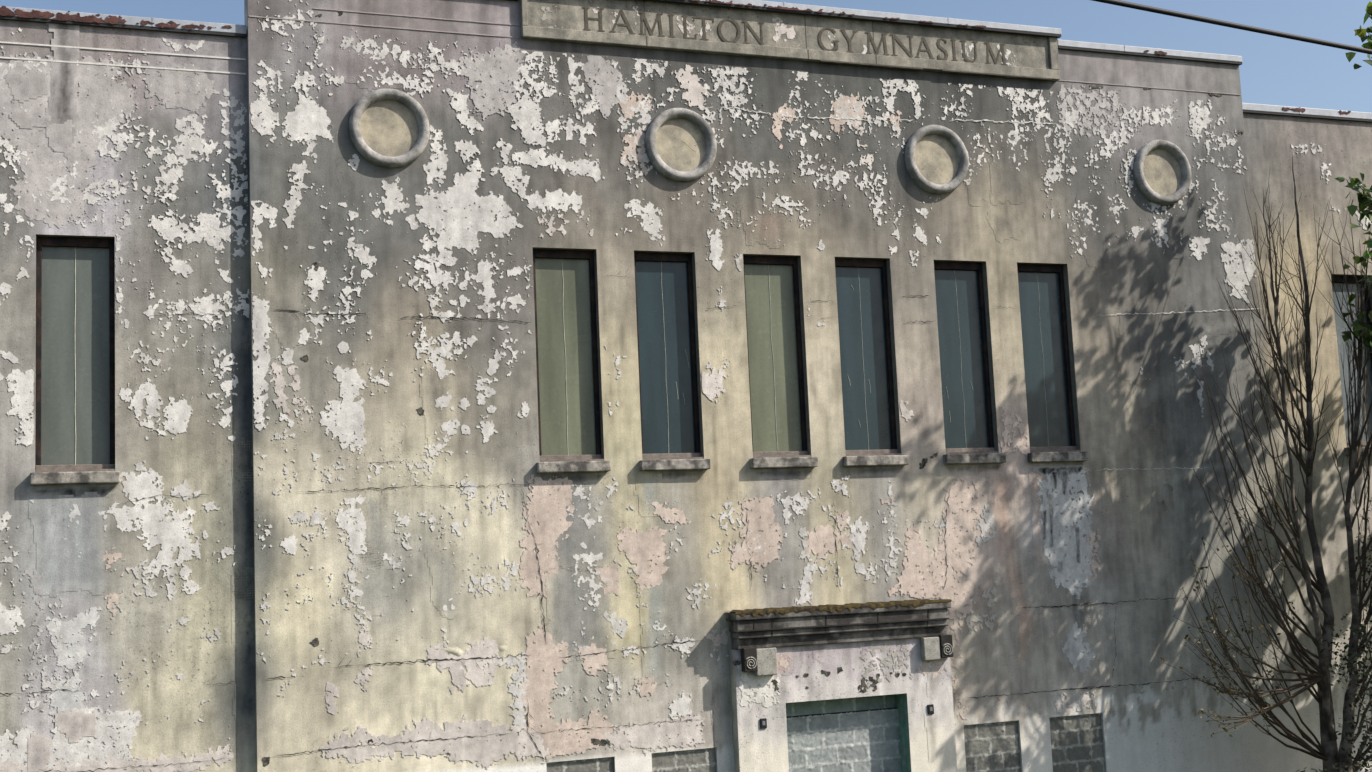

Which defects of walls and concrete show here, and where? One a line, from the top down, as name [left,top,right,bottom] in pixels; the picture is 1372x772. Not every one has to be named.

leakage [232,35,248,106]
peeling [0,0,1256,657]
leakage [420,363,452,451]
leakage [229,283,319,724]
crack [308,461,702,671]
spalling [278,638,331,697]
peeling [320,473,1002,769]
peeling [1053,621,1098,714]
crack [285,700,702,760]